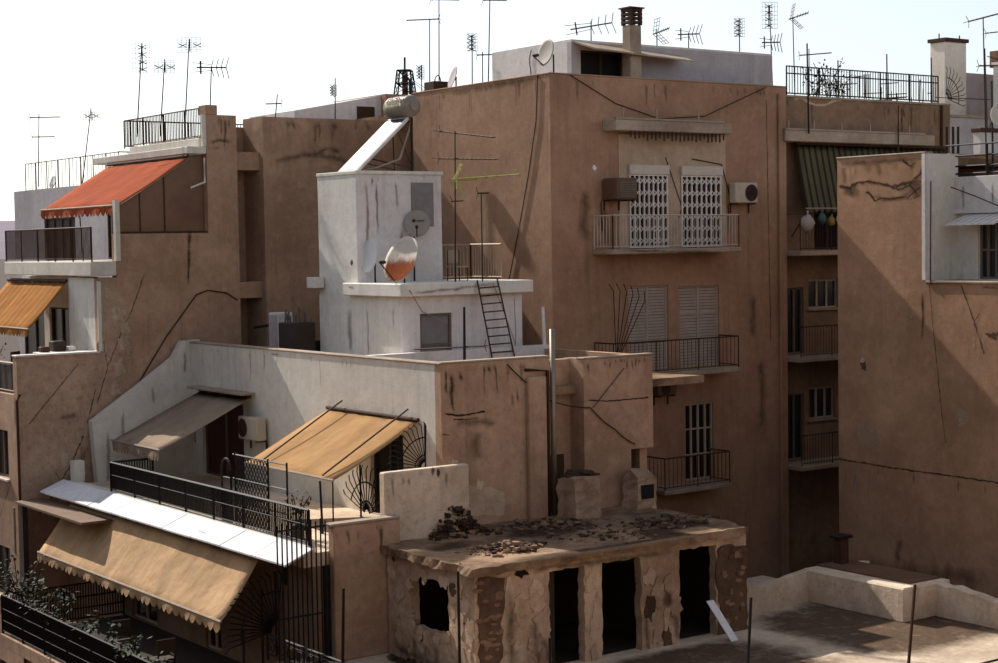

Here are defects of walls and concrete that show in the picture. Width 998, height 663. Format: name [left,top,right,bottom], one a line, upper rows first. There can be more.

crack [839,160,922,201]
crack [961,285,984,354]
crack [588,395,649,403]
crack [839,458,998,484]